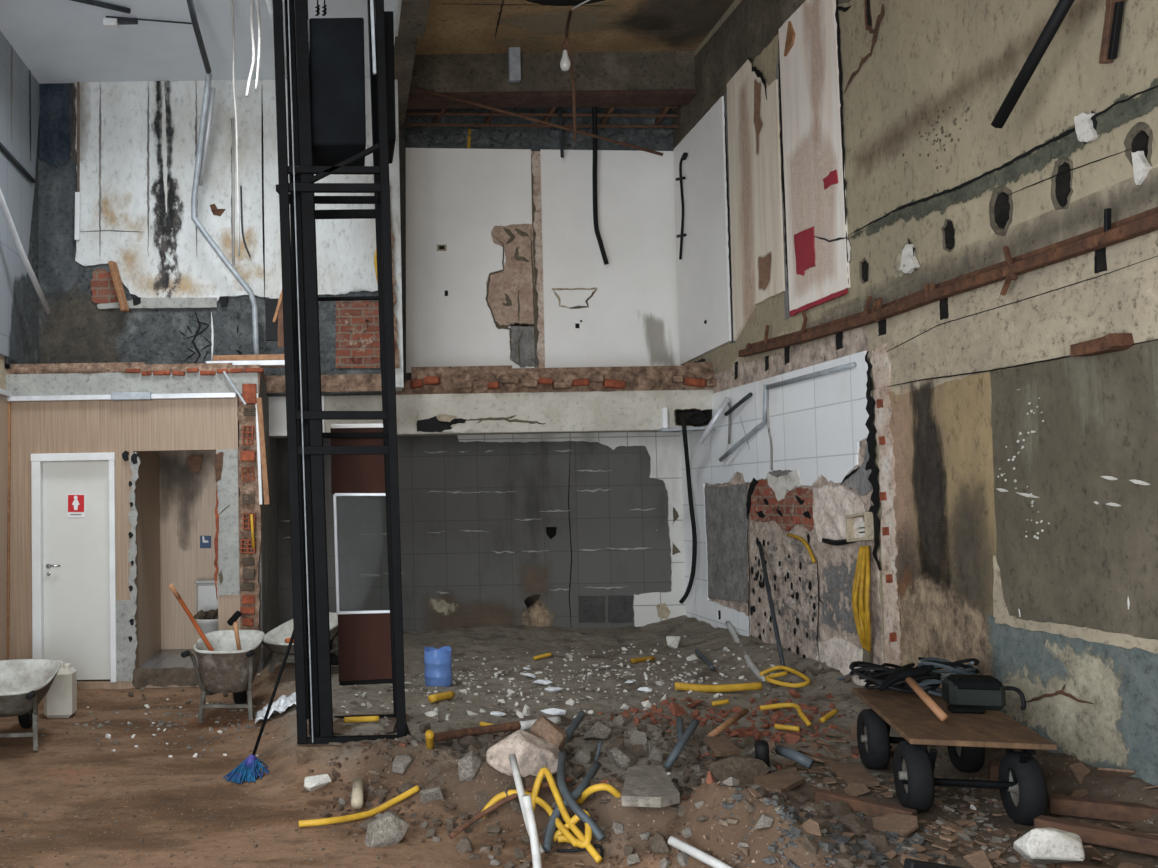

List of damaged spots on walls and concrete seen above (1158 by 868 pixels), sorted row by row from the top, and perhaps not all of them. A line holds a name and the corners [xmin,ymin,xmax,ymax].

water stain [151,81,183,298]
peeling [210,204,226,216]
crack [748,0,1158,309]
peeling [1074,110,1100,145]
peeling [1131,151,1152,185]
flaking render [90,269,118,304]
crack [179,311,214,364]
peeling [485,224,538,368]
flaking render [579,595,633,623]
flaking render [704,436,887,686]
peeling [886,556,1158,769]
water stain [897,382,1158,786]